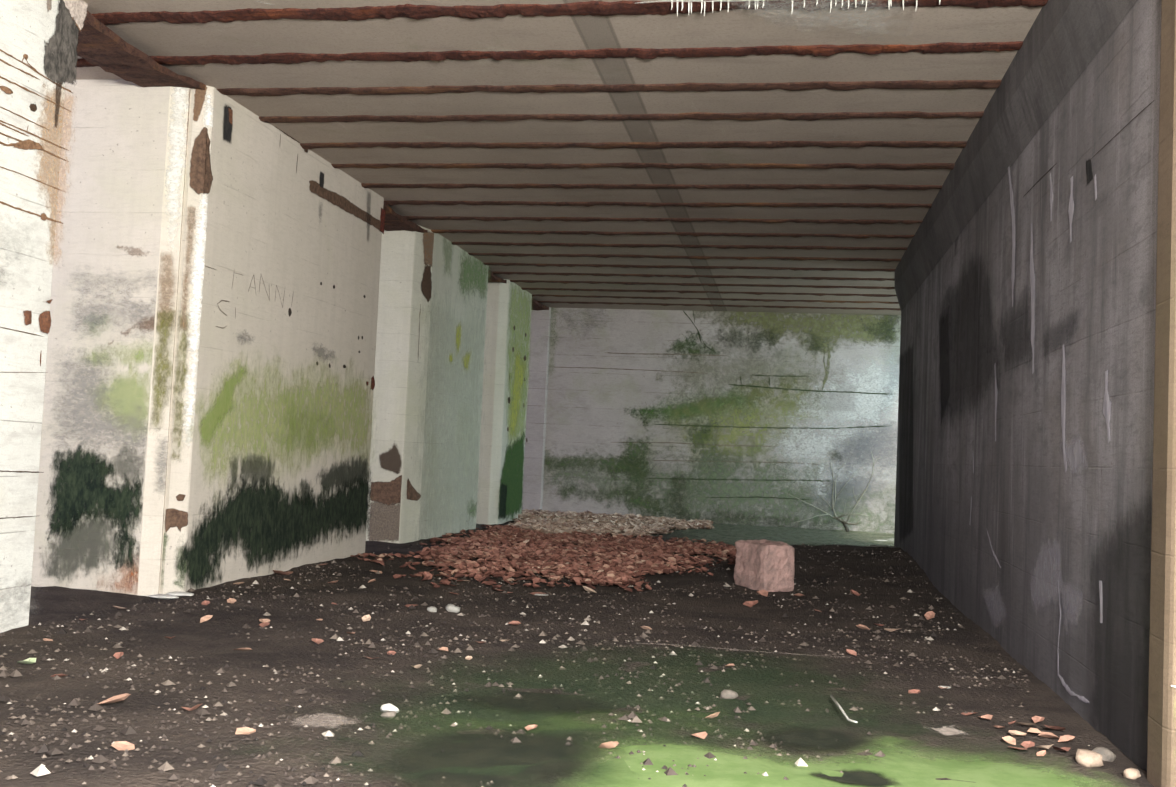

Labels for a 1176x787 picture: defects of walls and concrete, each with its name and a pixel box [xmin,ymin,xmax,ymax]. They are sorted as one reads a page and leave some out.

water stain [640,0,764,16]
water stain [791,0,867,14]
spalling [44,0,88,127]
spalling [189,127,213,194]
water stain [1008,166,1016,307]
water stain [822,344,831,390]
water stain [1102,370,1111,443]
water stain [47,361,145,577]
water stain [176,444,402,589]
spalling [368,475,421,542]
water stain [1057,583,1089,703]